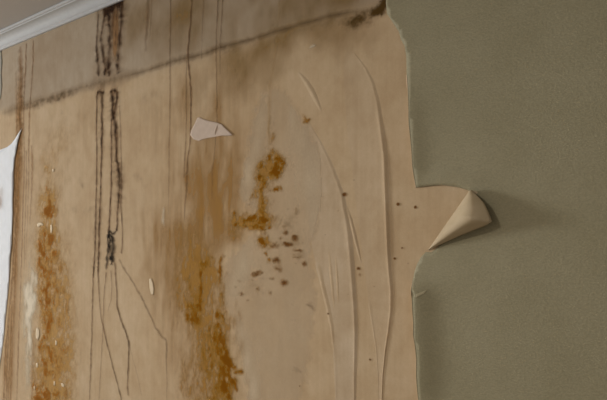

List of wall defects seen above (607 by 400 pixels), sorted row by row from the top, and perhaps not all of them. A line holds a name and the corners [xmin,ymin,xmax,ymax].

leakage [96,1,123,76]
leakage [348,0,386,27]
peeling [23,270,37,375]
corrosion [32,187,75,400]
leakage [94,227,117,267]
leakage [96,90,120,203]
leakage [167,136,240,269]
corrosion [176,232,242,400]
peeling [190,117,232,141]
corrosion [231,149,285,261]